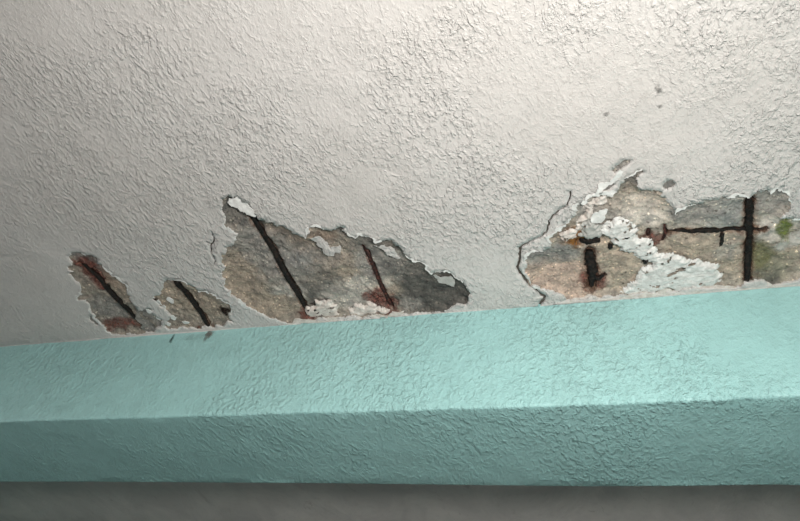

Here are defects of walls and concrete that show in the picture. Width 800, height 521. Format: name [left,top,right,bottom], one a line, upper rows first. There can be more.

spalling [68,196,470,335]
crack [516,191,571,304]
spalling [524,159,800,304]